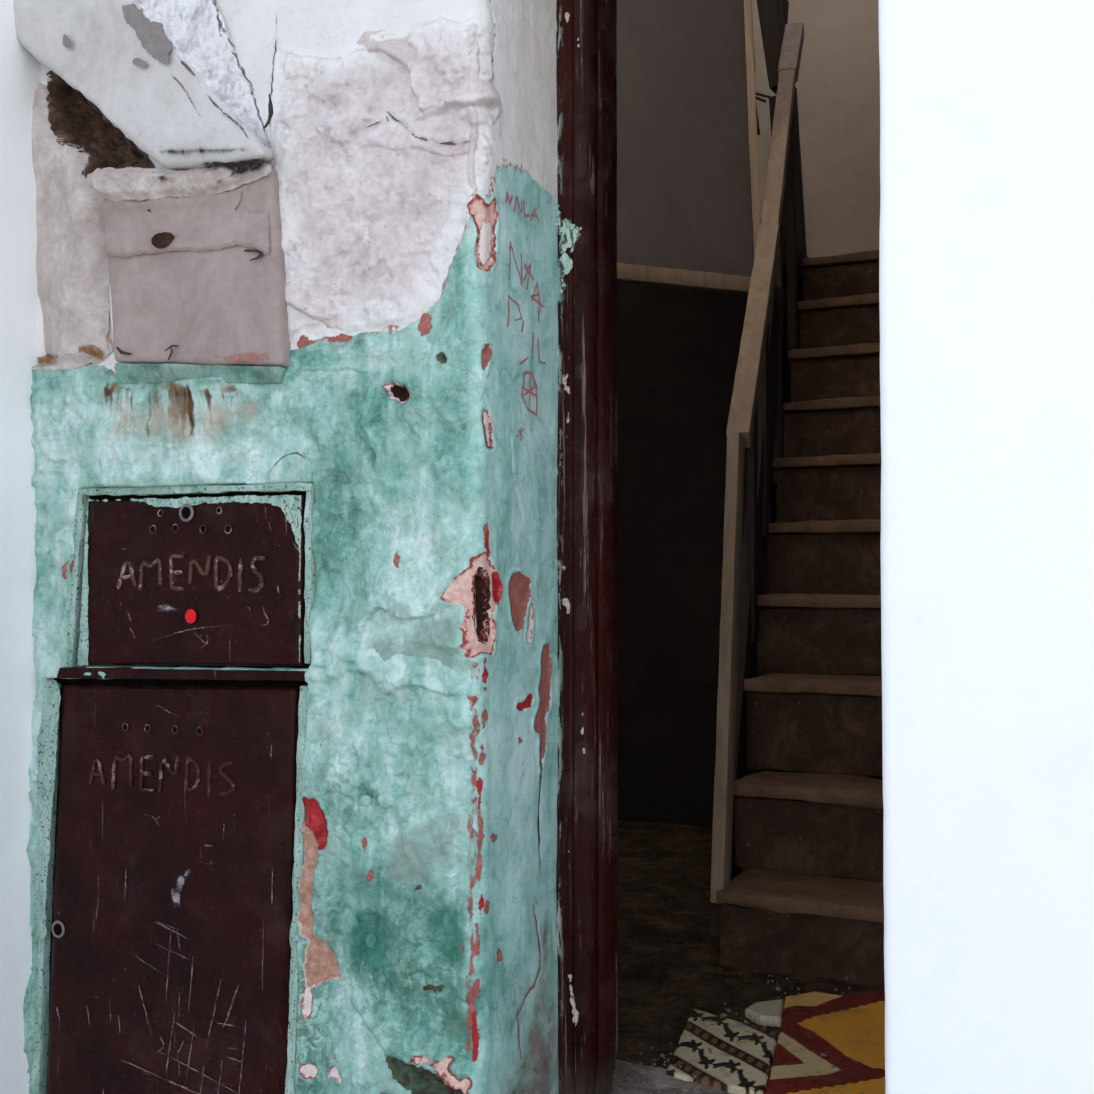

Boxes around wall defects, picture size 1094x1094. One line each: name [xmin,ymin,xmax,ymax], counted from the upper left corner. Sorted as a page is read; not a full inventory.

spalling [122,3,185,67]
flaking render [261,11,503,349]
corrosion [142,384,235,437]
spalling [382,382,411,404]
peeling [517,643,552,766]
spalling [440,517,534,1062]
spalling [297,797,341,1020]
peeling [423,984,444,992]
peeling [298,1063,341,1083]
spalling [384,1054,472,1094]